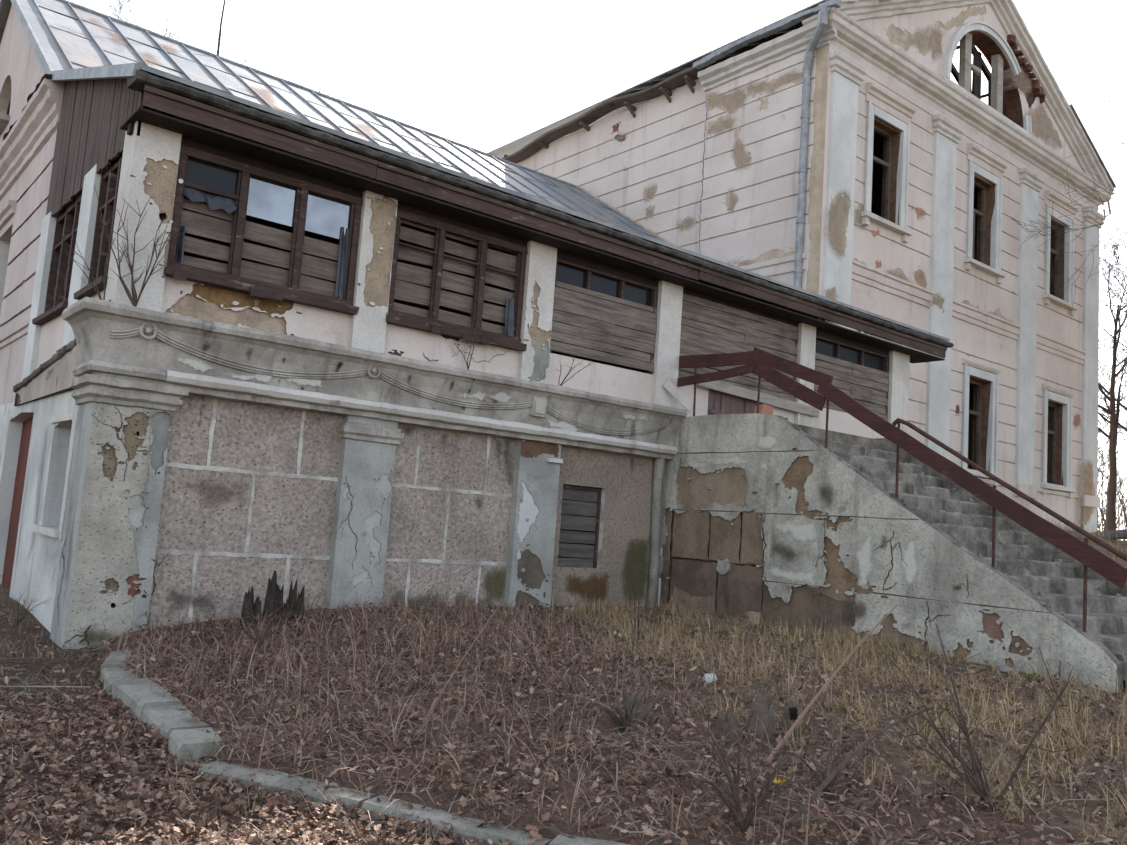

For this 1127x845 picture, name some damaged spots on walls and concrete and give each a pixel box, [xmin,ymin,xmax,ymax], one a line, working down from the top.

peeling [884,5,986,59]
peeling [708,66,803,175]
spalling [130,158,183,278]
peeling [828,192,944,313]
spalling [165,283,302,336]
spalling [524,281,553,381]
spalling [96,411,171,482]
crack [337,478,358,569]
spalling [515,478,549,607]
spalling [660,448,929,652]
crack [873,531,908,592]
spalling [947,609,1038,668]